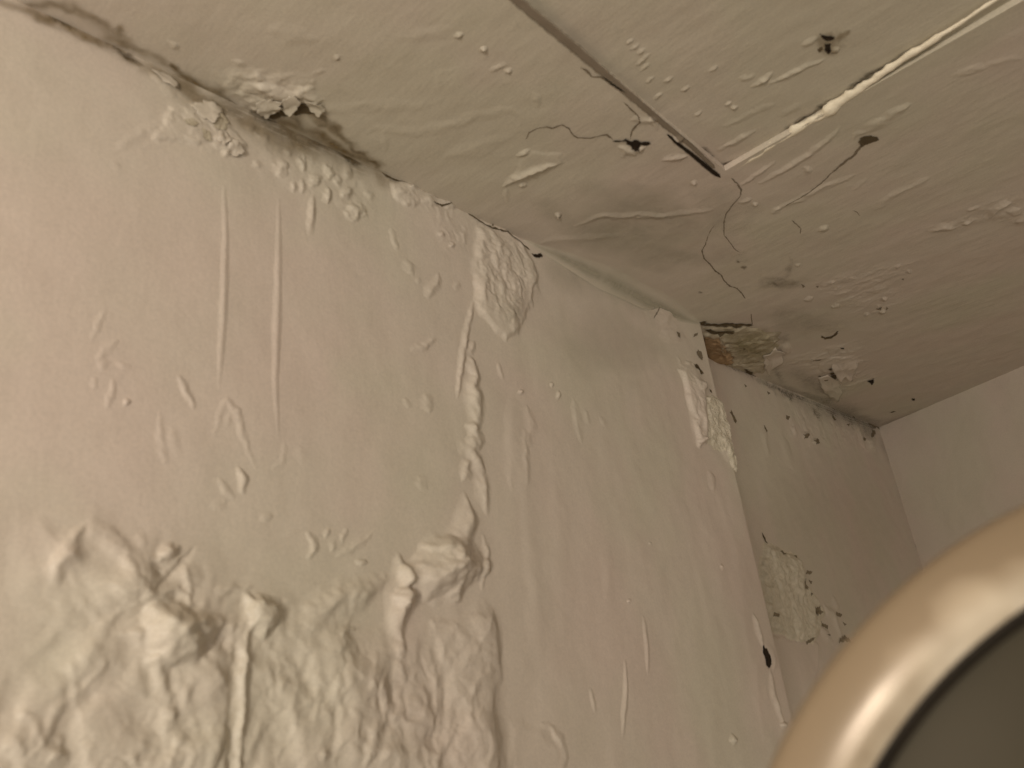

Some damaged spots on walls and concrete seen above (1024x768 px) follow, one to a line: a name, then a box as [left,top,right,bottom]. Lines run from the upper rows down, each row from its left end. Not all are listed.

leakage [36,12,136,62]
leakage [171,65,229,101]
peeling [109,58,333,172]
leakage [273,113,379,167]
crack [667,134,745,298]
peeling [642,308,786,472]
peeling [752,542,849,729]